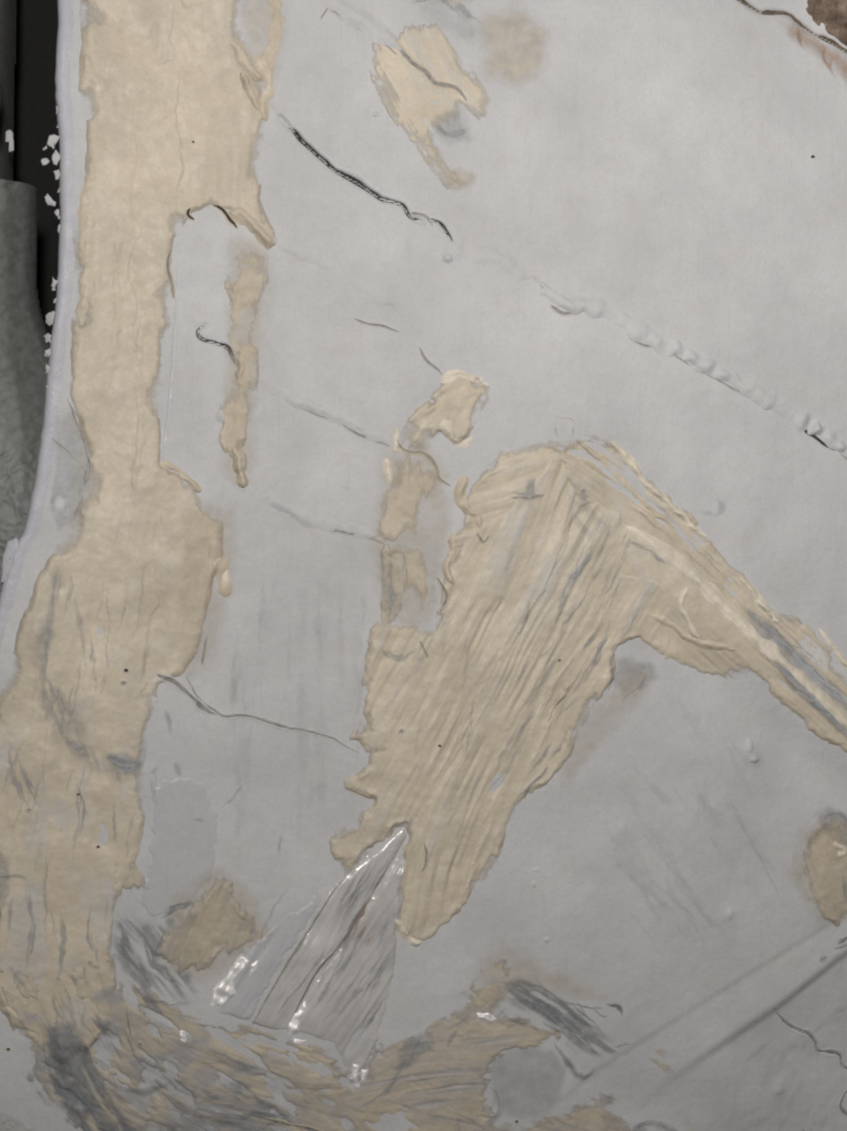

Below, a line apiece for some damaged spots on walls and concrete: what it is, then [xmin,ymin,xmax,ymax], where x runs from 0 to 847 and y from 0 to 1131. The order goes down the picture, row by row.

spalling [5,0,60,389]
crack [282,121,453,241]
peeling [0,537,20,584]
crack [157,635,359,753]
crack [234,1110,324,1131]
crack [774,1010,847,1118]